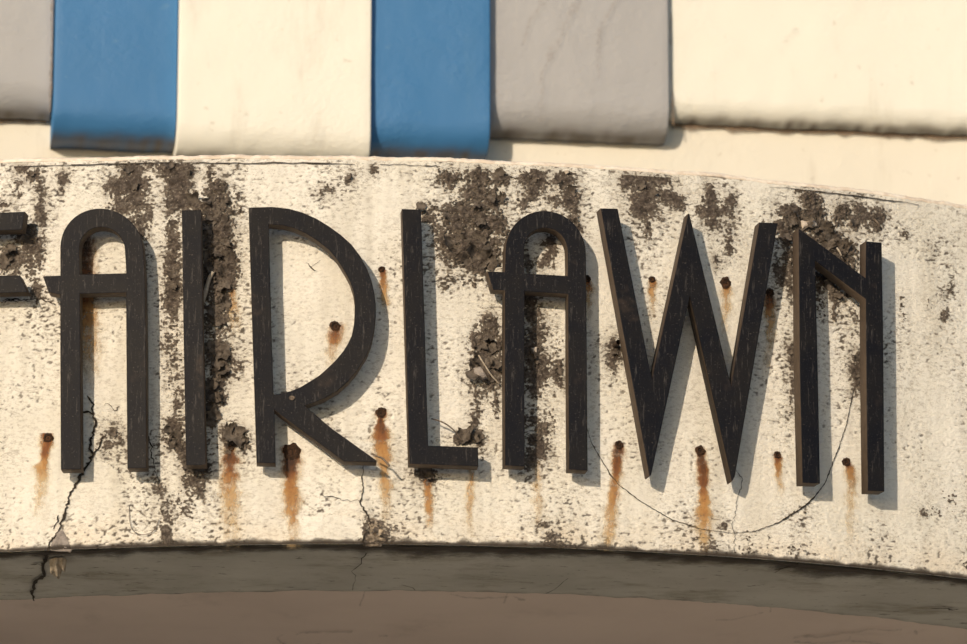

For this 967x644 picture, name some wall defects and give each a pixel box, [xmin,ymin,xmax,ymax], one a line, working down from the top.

rust [82,236,93,274]
water stain [0,161,967,585]
rust [35,433,54,495]
crack [30,396,119,601]
rust [222,445,239,507]
rust [282,443,301,524]
crack [320,469,372,590]
rust [373,407,391,498]
rust [606,440,624,543]
rust [695,445,712,543]
crack [587,391,854,551]
rust [842,457,855,494]